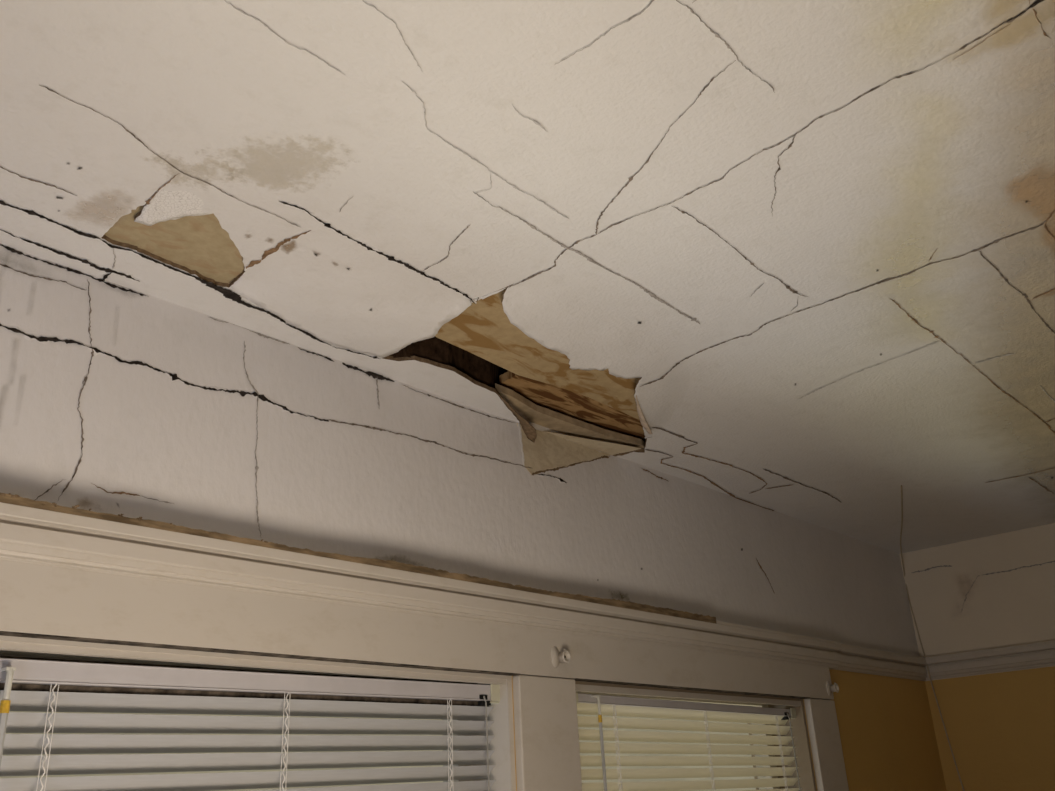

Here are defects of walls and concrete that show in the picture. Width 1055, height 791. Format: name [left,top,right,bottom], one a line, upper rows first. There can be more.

crack [226,2,345,75]
crack [0,166,77,196]
peeling [104,186,311,284]
crack [39,85,477,304]
crack [363,0,1055,435]
water stain [1007,97,1055,490]
crack [0,201,566,537]
peeling [497,393,641,476]
crack [643,427,841,511]